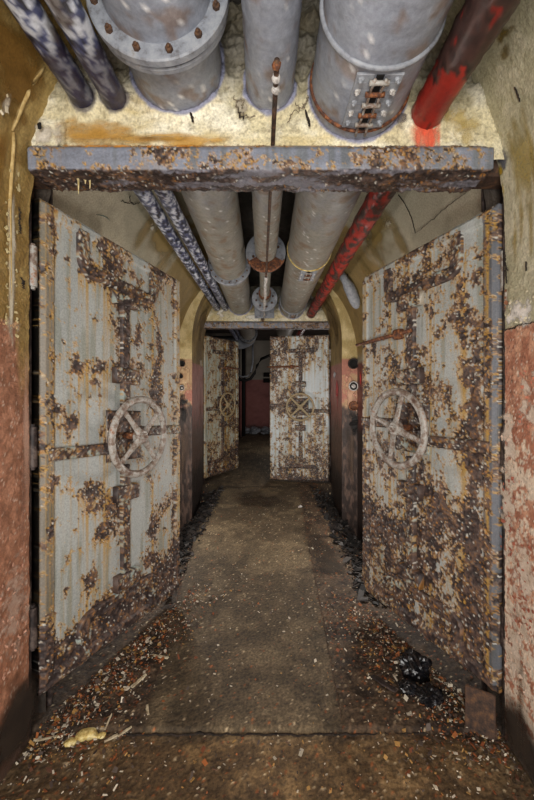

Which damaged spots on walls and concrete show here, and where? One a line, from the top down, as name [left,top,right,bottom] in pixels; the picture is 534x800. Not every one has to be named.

corrosion [247,257,285,273]
crack [106,486,428,737]
peeling [499,370,534,681]